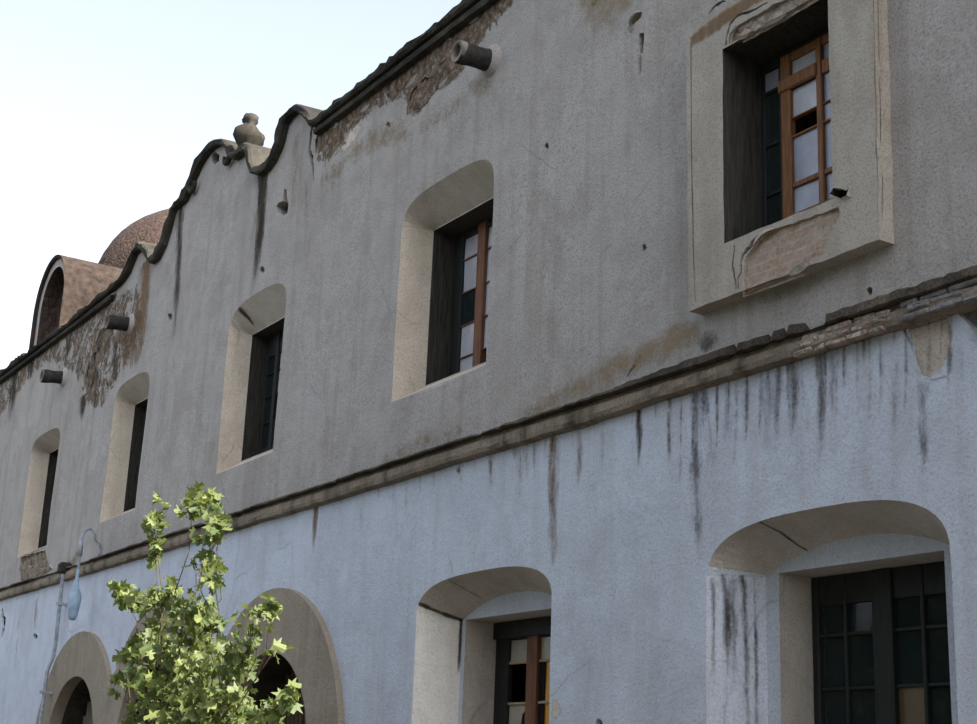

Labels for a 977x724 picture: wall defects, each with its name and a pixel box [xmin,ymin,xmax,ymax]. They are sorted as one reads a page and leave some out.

flaking render [0,285,141,413]